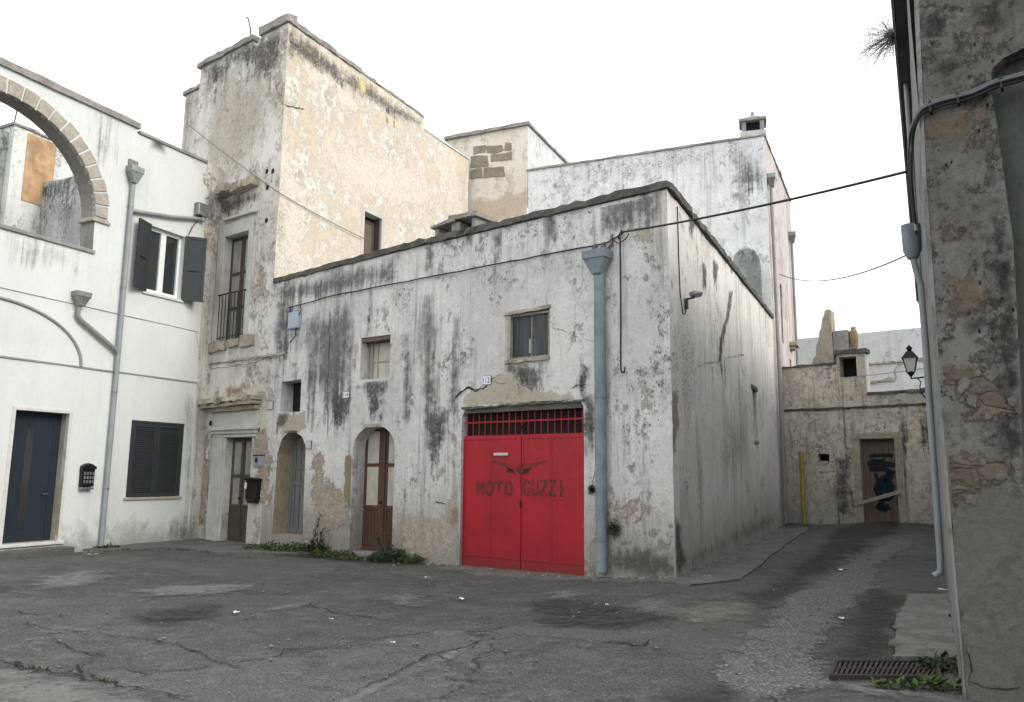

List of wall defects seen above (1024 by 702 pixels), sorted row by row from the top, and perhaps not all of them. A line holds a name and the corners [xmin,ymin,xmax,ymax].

leakage [208,32,415,121]
peeling [277,147,314,277]
leakage [307,310,352,424]
leakage [423,302,453,467]
crack [450,372,505,412]
flaking render [463,372,574,407]
leakage [508,364,541,391]
spalling [942,363,1017,423]
spalling [254,411,306,506]
spalling [303,448,351,549]
flaking render [398,497,457,557]
spalling [607,497,643,523]